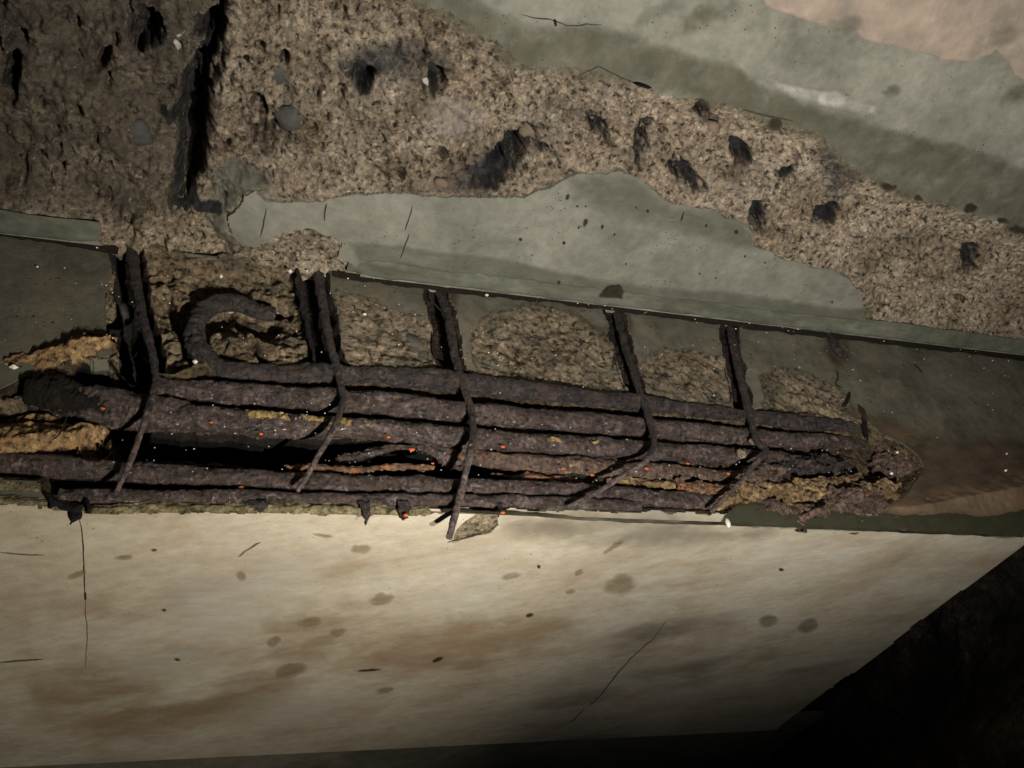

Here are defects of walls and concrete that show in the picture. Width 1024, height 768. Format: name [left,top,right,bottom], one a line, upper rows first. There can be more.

spalling [0,0,1024,398]
rust [44,492,92,525]
spalling [0,476,443,516]
rust [237,486,268,512]
spalling [107,428,524,480]
rust [358,501,371,525]
rust [396,500,412,521]
spalling [448,507,546,543]
spalling [190,347,923,515]
rust [717,419,1024,535]
crack [79,520,88,666]
crack [570,622,666,723]